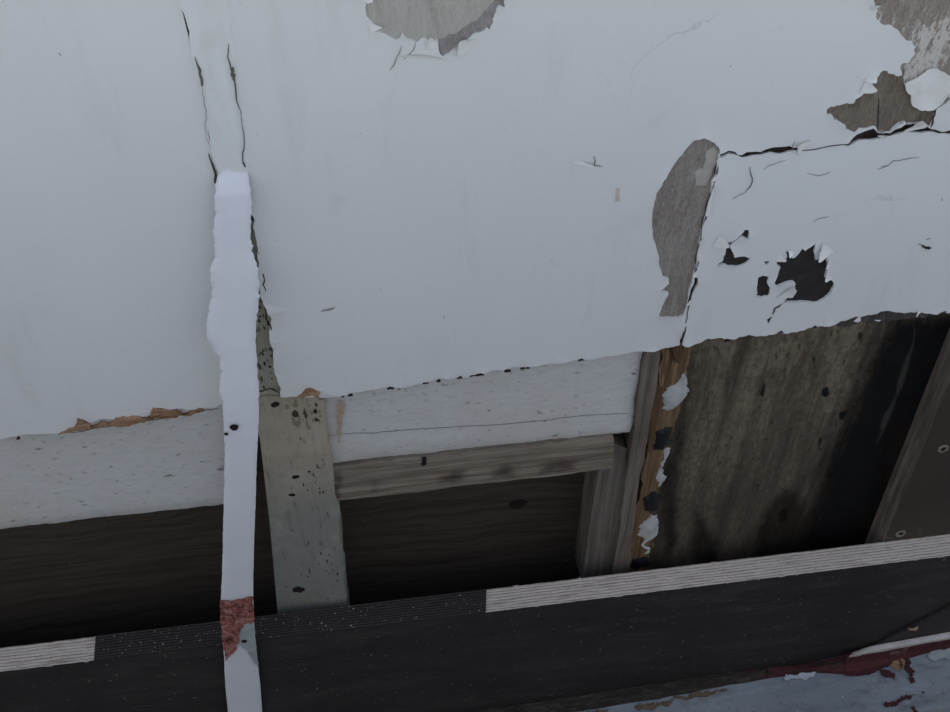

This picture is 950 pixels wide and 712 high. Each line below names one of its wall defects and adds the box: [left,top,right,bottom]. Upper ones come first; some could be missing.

crack [195,58,217,184]
crack [227,45,246,167]
peeling [362,0,504,56]
peeling [827,0,950,134]
crack [250,215,273,355]
peeling [652,138,749,317]
peeling [757,244,834,323]
crack [681,124,950,343]
leakage [664,415,683,548]
leakage [693,521,715,564]
leakage [758,316,950,557]